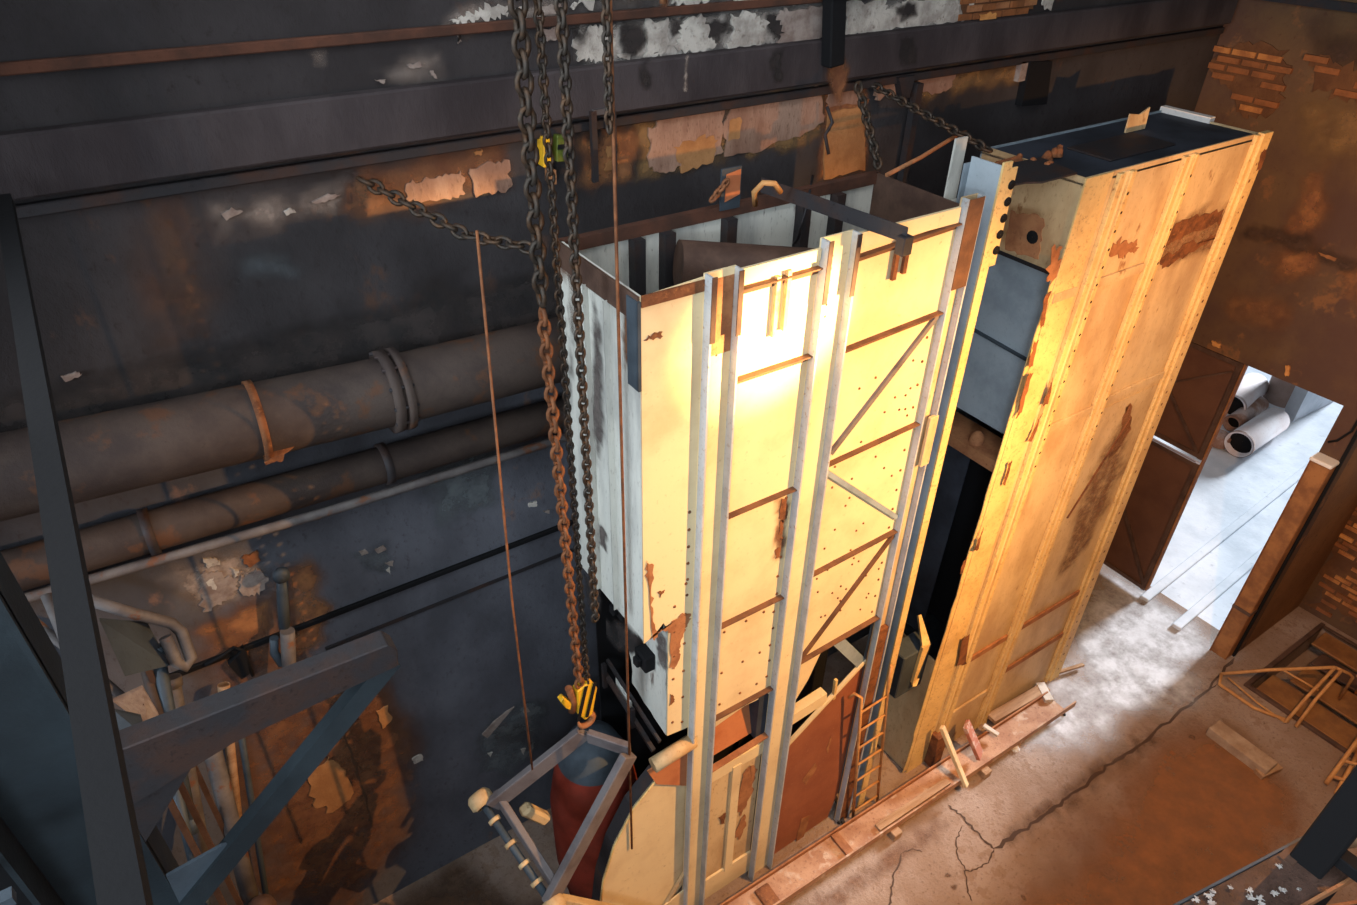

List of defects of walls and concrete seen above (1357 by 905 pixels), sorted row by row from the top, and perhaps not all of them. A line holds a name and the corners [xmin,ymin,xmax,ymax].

peeling [449,0,823,63]
peeling [845,0,1054,35]
peeling [917,67,1016,97]
spalling [1208,40,1357,119]
peeling [582,84,896,185]
peeling [221,206,296,221]
peeling [312,146,513,215]
peeling [60,371,82,382]
peeling [179,550,294,686]
spalling [238,688,423,901]
crack [948,657,1235,901]
crack [888,848,923,905]